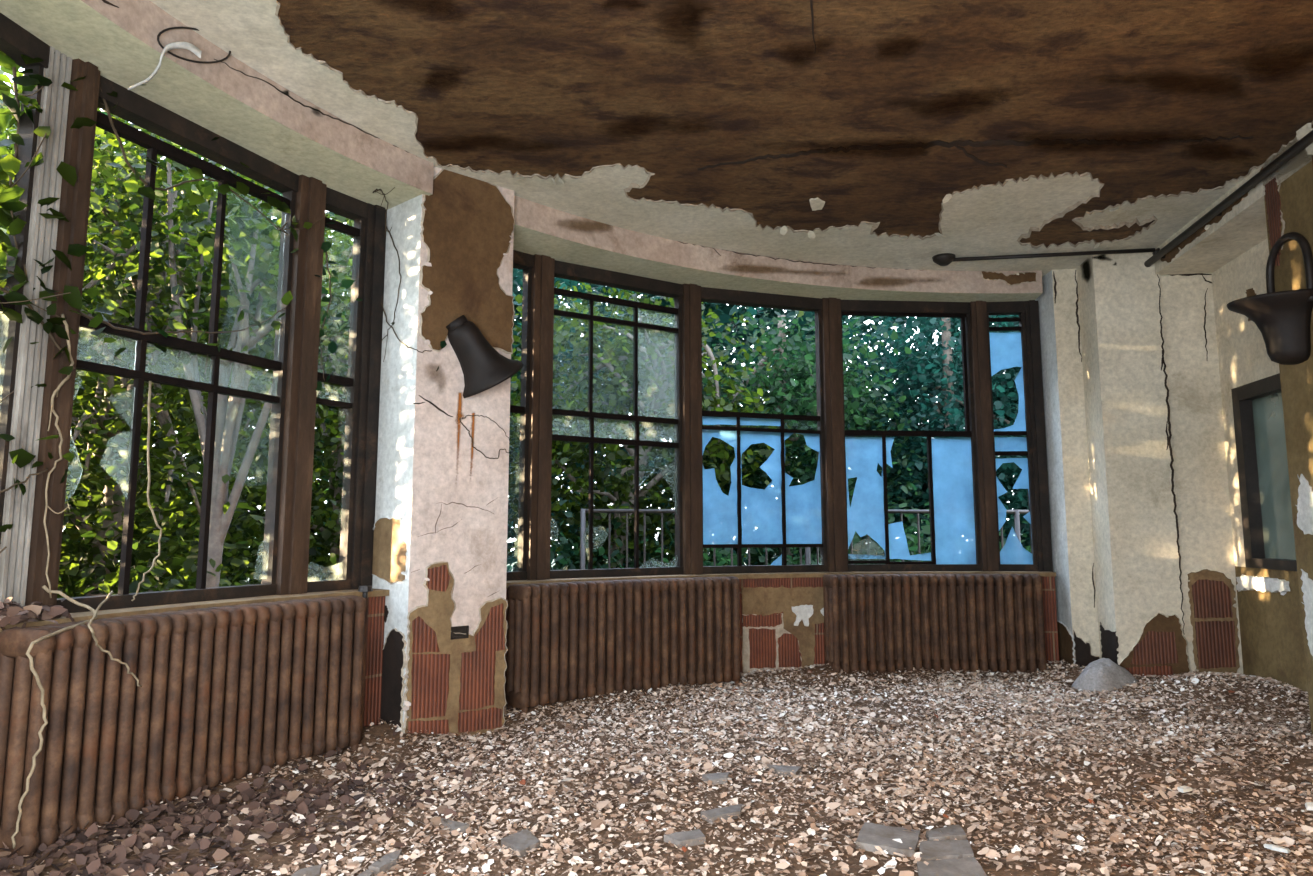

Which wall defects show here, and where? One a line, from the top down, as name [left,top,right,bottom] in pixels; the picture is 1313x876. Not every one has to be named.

damp [427,137,506,149]
peeling [275,0,1313,354]
damp [816,142,931,155]
damp [567,221,610,231]
damp [730,266,820,274]
damp [861,278,933,286]
peeling [1296,474,1313,535]
flaking render [372,517,409,585]
flaking render [380,561,508,736]
flaking render [742,605,824,673]
flaking render [1057,569,1313,678]